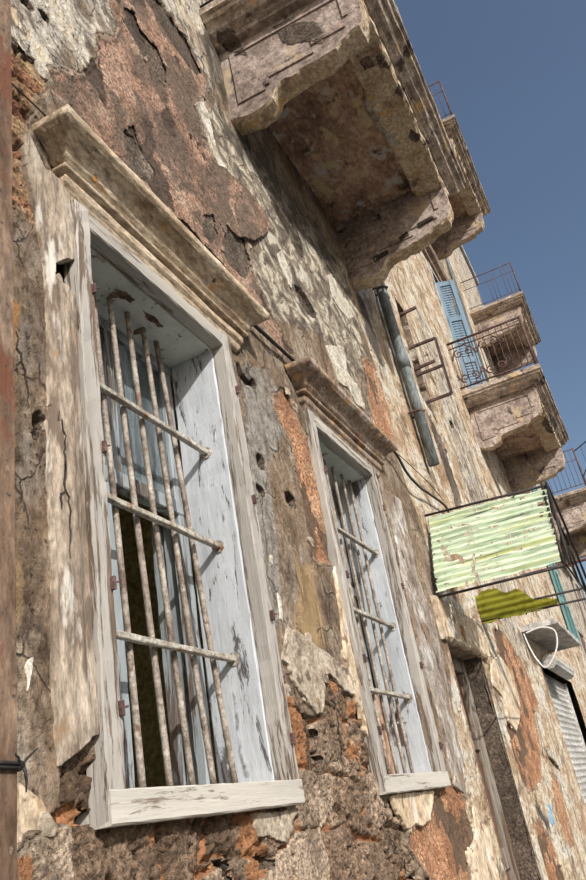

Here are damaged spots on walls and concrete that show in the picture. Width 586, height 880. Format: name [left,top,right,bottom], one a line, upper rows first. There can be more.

spalling [11,0,294,357]
crack [15,330,29,405]
crack [58,411,72,559]
spalling [17,387,500,880]
spalling [490,623,573,848]
spalling [532,818,565,880]